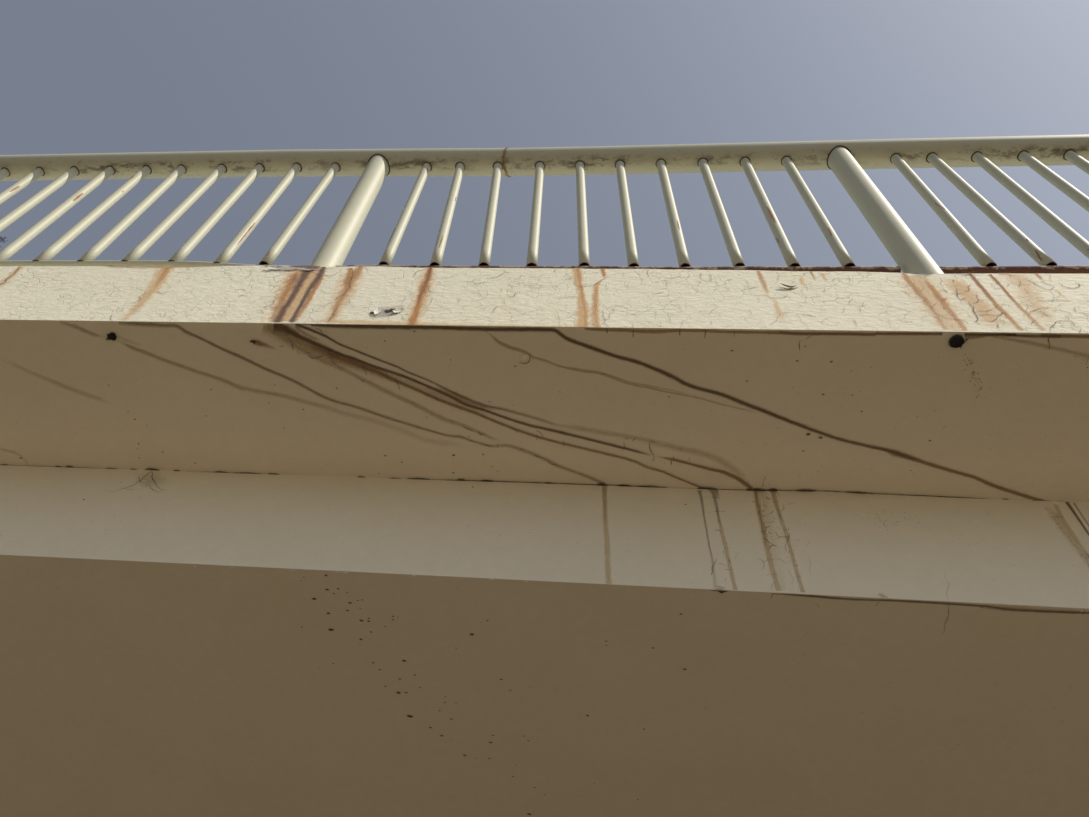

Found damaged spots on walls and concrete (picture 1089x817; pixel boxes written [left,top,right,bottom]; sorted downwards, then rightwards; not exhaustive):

corrosion [272,267,326,322]
crack [233,268,400,389]
corrosion [330,266,362,321]
corrosion [409,267,433,325]
corrosion [573,268,605,327]
crack [405,267,1089,350]
corrosion [902,273,1040,330]
water stain [127,321,1089,614]
corrosion [1066,502,1089,535]